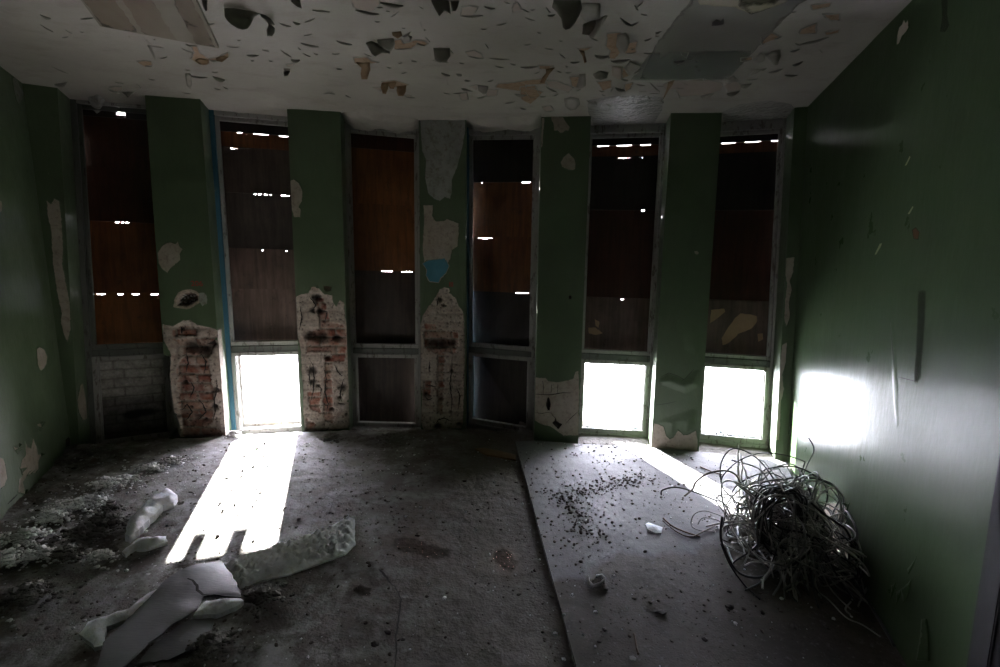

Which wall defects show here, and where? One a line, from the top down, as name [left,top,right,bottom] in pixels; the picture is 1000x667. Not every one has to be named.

peeling [181,0,329,94]
peeling [350,0,841,133]
peeling [897,18,910,46]
peeling [46,198,72,342]
peeling [157,241,183,273]
peeling [419,120,466,264]
peeling [0,437,45,495]
flaking render [162,289,229,437]
flaking render [296,286,350,432]
flaking render [420,287,465,430]
flaking render [534,370,582,454]
peeling [651,423,698,451]